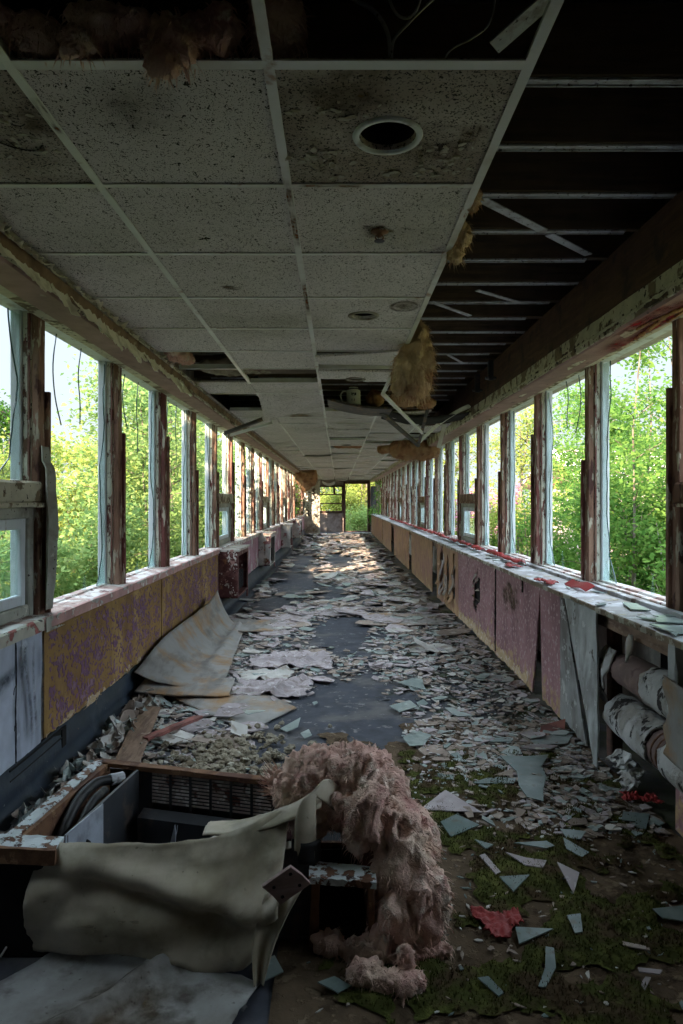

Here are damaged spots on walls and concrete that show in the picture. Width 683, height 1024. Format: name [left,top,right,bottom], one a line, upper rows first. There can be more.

spalling [0,308,18,471]
spalling [52,334,62,425]
peeling [0,221,203,397]
spalling [566,375,581,433]
peeling [46,364,237,738]
peeling [458,610,528,686]